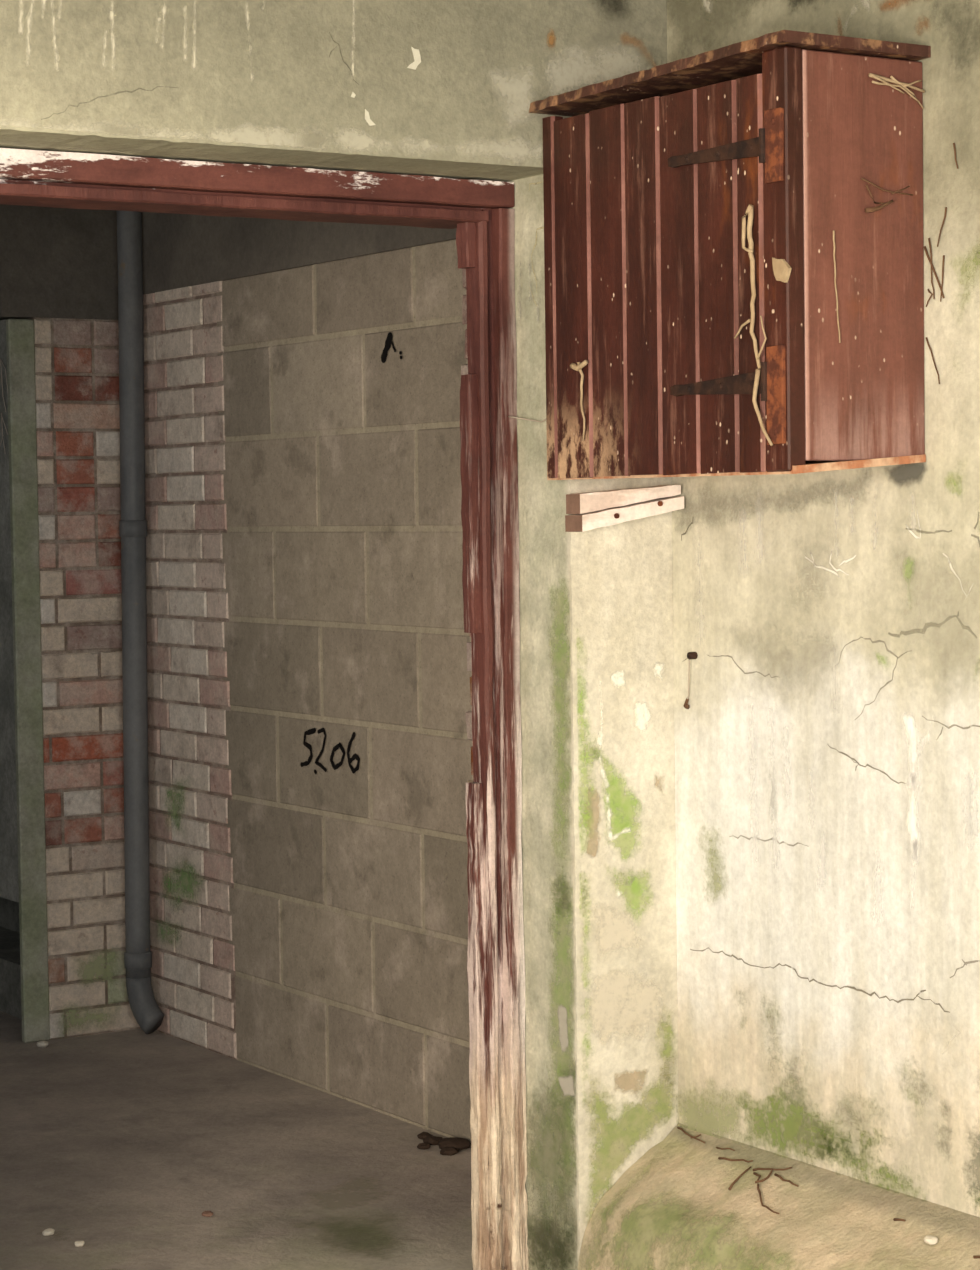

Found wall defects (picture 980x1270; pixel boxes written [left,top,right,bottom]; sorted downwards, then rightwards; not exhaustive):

crack [838,611,977,720]
crack [922,716,980,735]
crack [828,745,909,785]
crack [690,948,978,1012]
leakage [969,1135,980,1190]